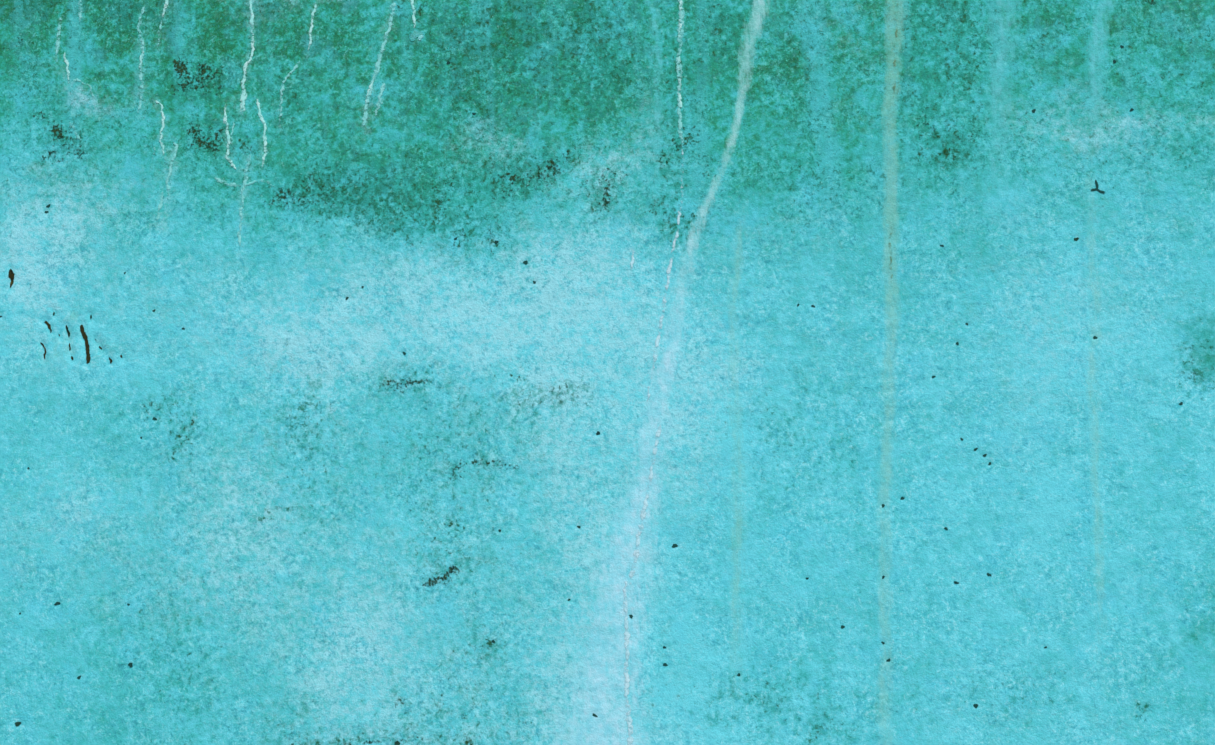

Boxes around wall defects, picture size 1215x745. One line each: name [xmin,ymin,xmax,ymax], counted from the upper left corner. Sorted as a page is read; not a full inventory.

crack [55,0,94,96]
crack [137,0,178,224]
crack [215,0,317,245]
crack [362,3,396,126]
leakage [540,0,773,745]
leakage [1160,303,1215,424]
leakage [1141,608,1215,682]